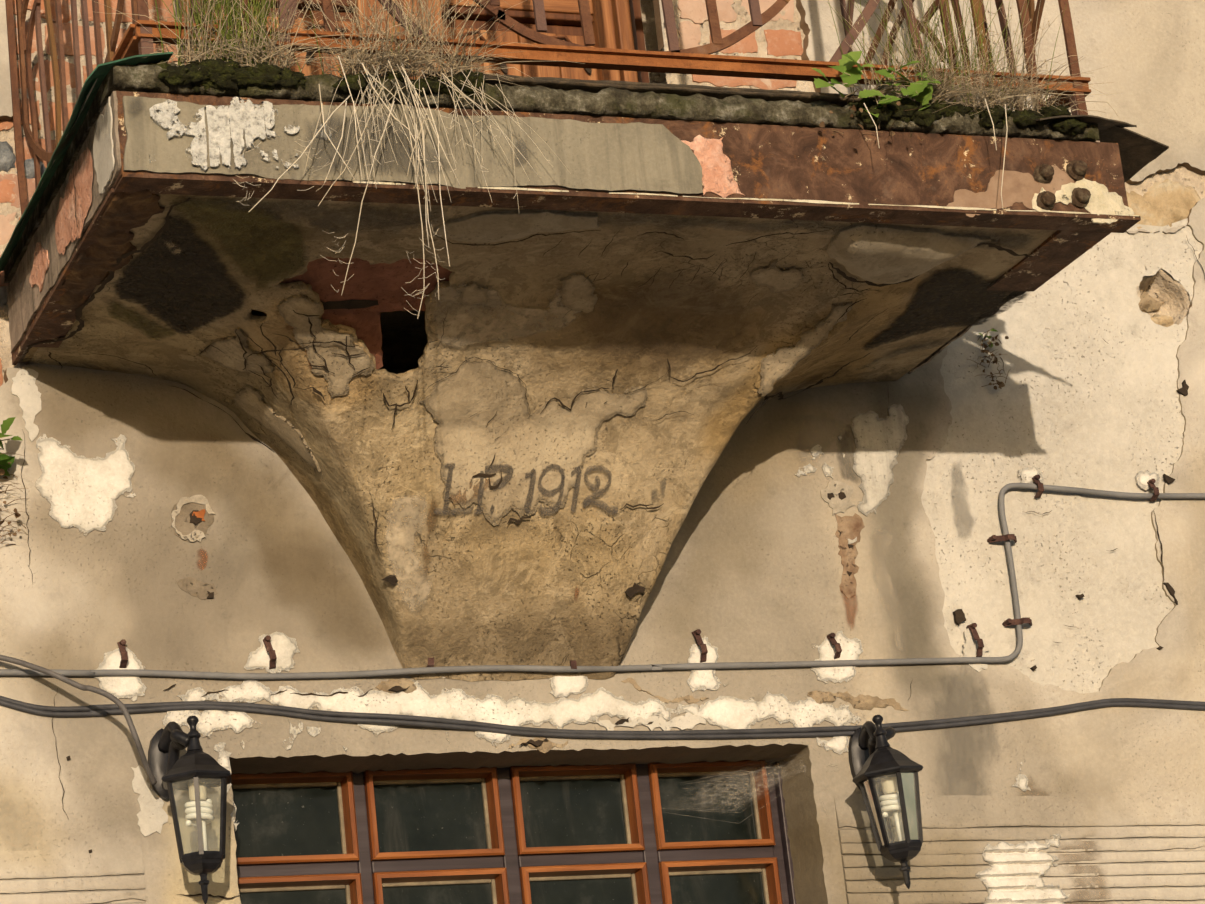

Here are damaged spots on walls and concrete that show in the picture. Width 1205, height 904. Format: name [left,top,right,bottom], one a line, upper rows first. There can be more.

spalling [681,135,746,198]
spalling [0,0,136,535]
crack [23,198,274,452]
damp [109,200,304,339]
crack [196,310,370,405]
crack [470,412,502,489]
crack [383,311,757,430]
peeling [794,404,909,599]
damp [864,270,1029,350]
peeling [921,166,1205,693]
rust [844,594,855,624]
peeling [162,678,909,831]